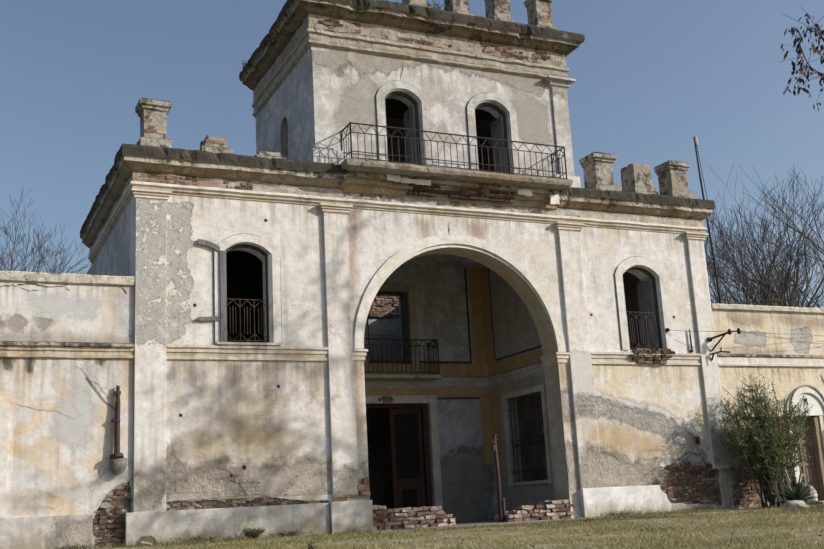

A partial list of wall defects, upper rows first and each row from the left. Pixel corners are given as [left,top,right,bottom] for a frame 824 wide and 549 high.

flaking render [317,19,366,37]
flaking render [395,37,462,52]
flaking render [480,43,559,63]
flaking render [386,174,532,203]
flaking render [135,200,197,345]
crack [3,283,71,292]
peeling [735,331,766,348]
peeling [790,327,812,354]
spalling [561,348,770,509]
spalling [51,444,371,549]
spalling [440,446,494,522]